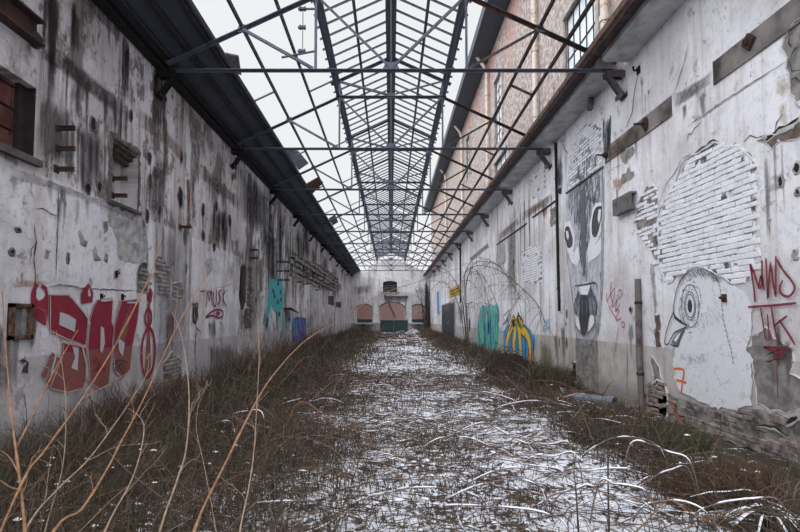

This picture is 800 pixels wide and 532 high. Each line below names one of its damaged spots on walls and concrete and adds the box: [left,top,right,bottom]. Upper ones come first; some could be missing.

leakage [41,0,129,181]
peeling [83,131,199,325]
leakage [204,164,343,321]
flaking render [289,255,341,308]
flaking render [470,238,542,284]
flaking render [567,121,602,189]
flaking render [633,141,800,464]
crack [656,62,799,223]
peeling [757,18,800,151]